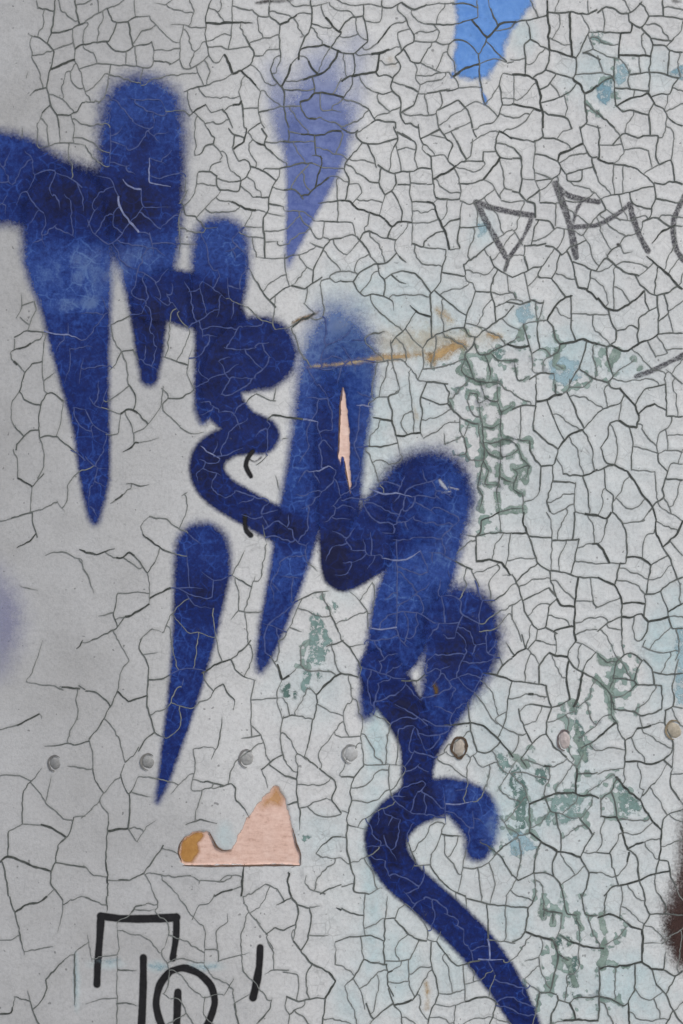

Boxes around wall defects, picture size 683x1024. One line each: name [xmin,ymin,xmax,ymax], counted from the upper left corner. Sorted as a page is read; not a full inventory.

crack [0,152,33,185]
crack [16,191,74,246]
corrosion [336,343,465,365]
peeling [338,387,351,490]
crack [28,0,683,852]
crack [0,519,435,1024]
peeling [178,786,310,867]
crack [337,745,470,895]
crack [335,774,683,1024]